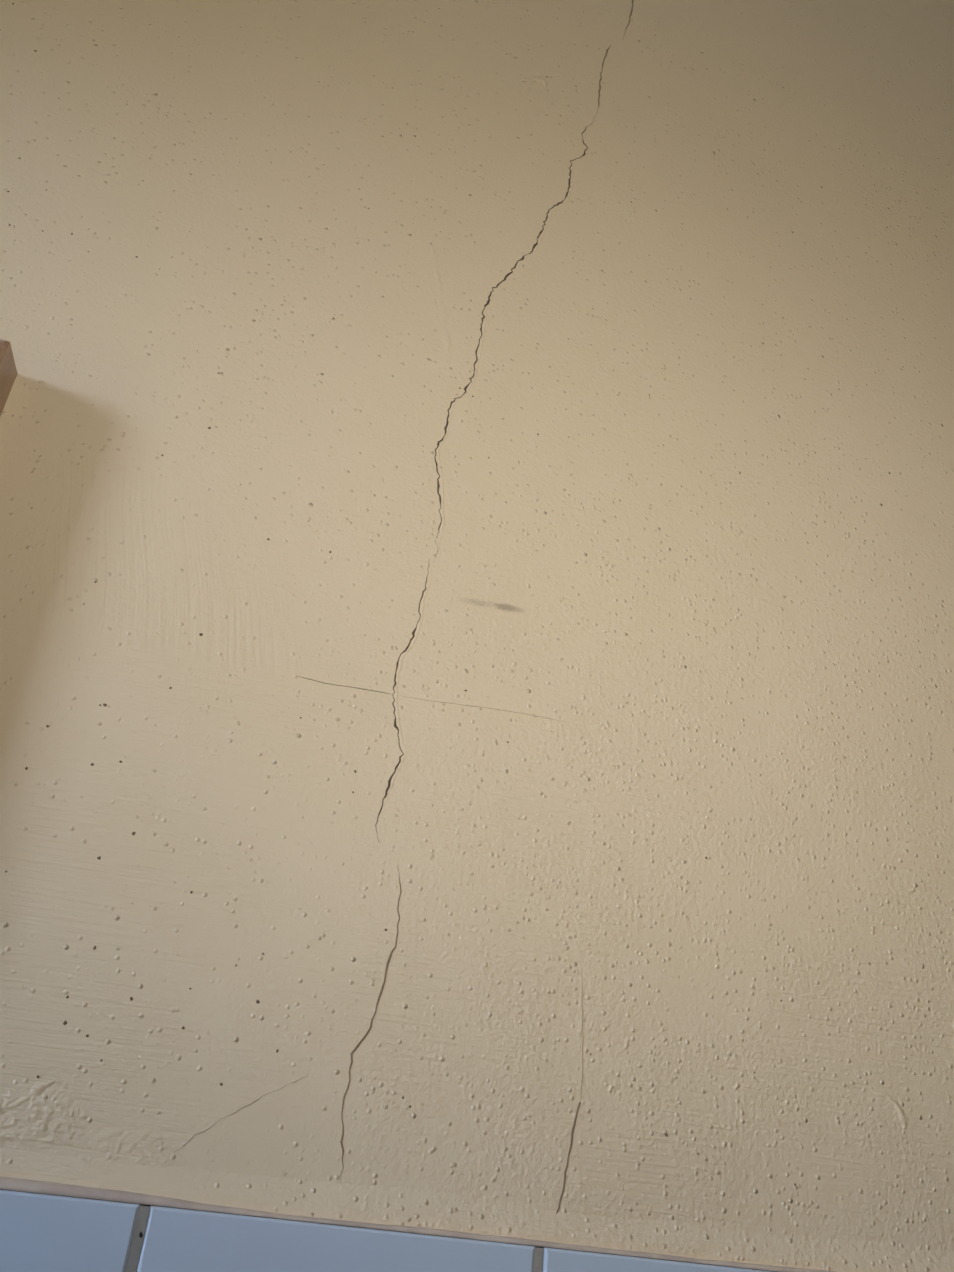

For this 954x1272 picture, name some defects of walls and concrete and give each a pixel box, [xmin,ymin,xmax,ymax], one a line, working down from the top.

crack [298,0,634,1214]